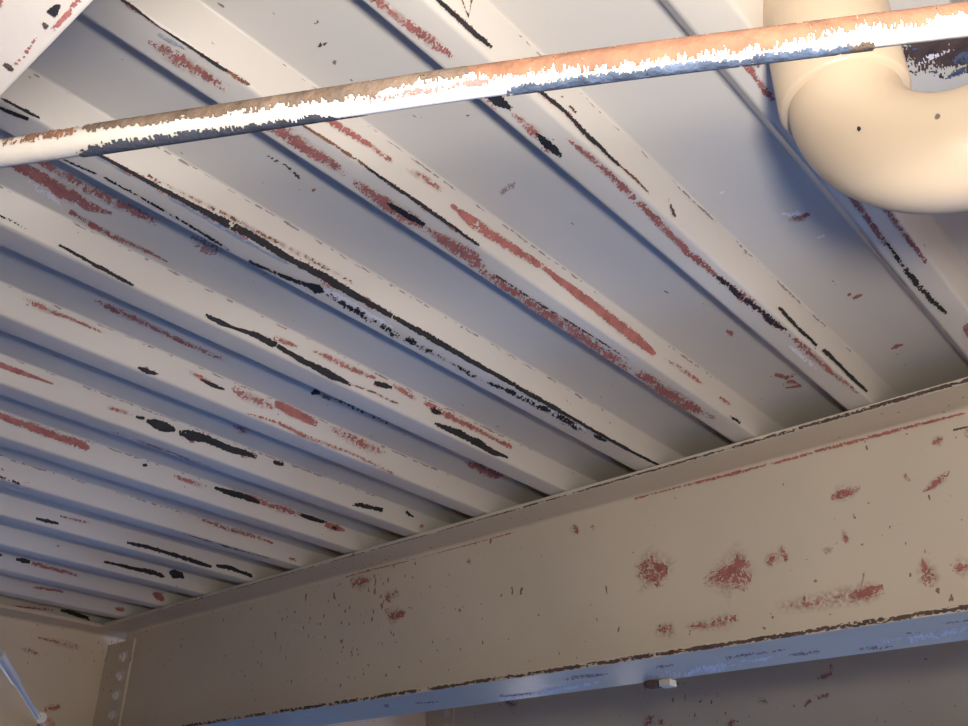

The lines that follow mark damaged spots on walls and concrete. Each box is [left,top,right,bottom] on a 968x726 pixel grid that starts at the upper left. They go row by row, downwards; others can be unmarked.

peeling [369,0,453,58]
peeling [436,0,493,48]
corrosion [2,1,968,146]
corrosion [303,125,368,168]
peeling [369,45,868,394]
peeling [0,114,715,474]
peeling [463,460,504,479]
corrosion [577,378,968,492]
corrosion [182,604,968,726]